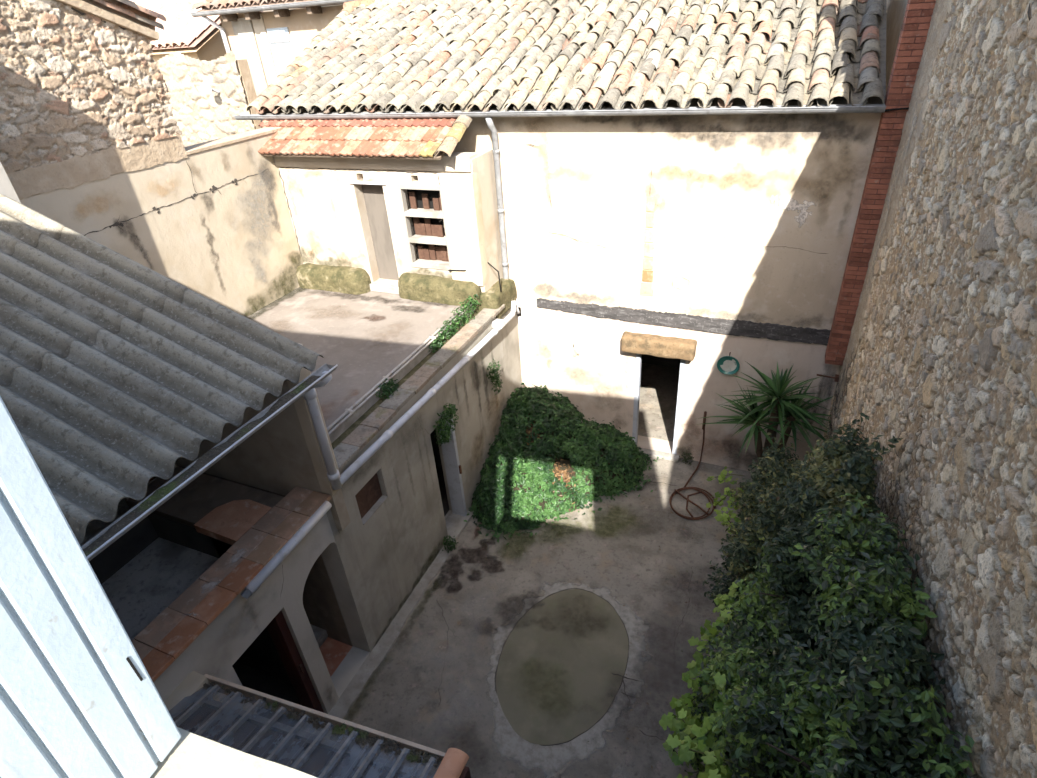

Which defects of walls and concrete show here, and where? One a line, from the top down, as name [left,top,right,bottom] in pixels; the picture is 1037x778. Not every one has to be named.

damp [634,114,797,147]
damp [805,113,862,140]